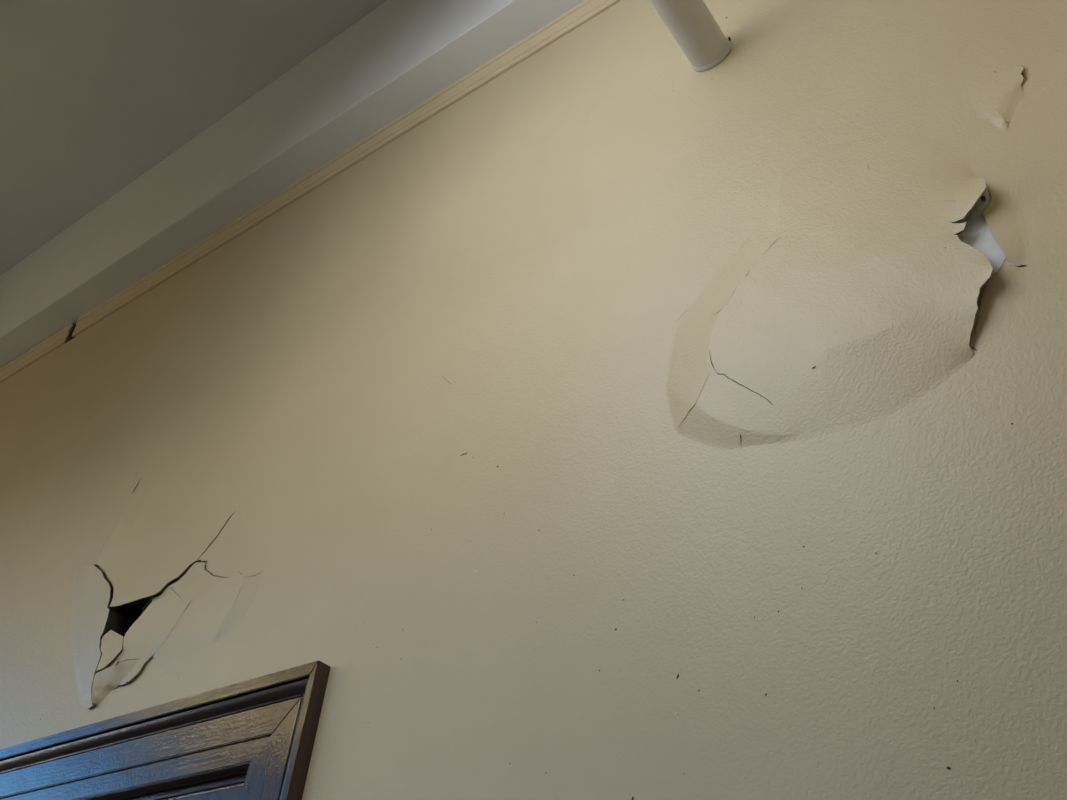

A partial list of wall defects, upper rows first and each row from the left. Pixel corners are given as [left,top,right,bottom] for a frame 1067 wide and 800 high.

crack [88,581,192,709]
peeling [96,565,192,672]